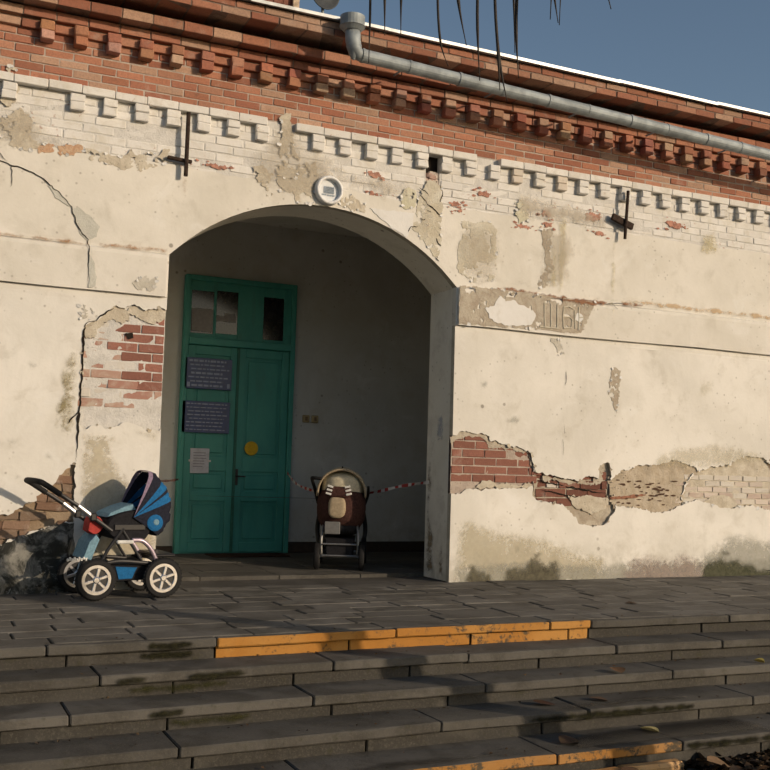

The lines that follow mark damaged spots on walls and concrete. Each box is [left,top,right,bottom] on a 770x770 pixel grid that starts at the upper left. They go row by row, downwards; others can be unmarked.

flaking render [0,87,170,172]
flaking render [253,113,319,206]
crack [0,153,90,288]
flaking render [400,157,597,355]
crack [68,309,113,457]
flaking render [76,304,166,433]
flaking render [0,462,76,546]
flaking render [450,431,770,526]
mould [467,567,491,582]
mould [505,558,559,581]
damp [627,543,770,578]